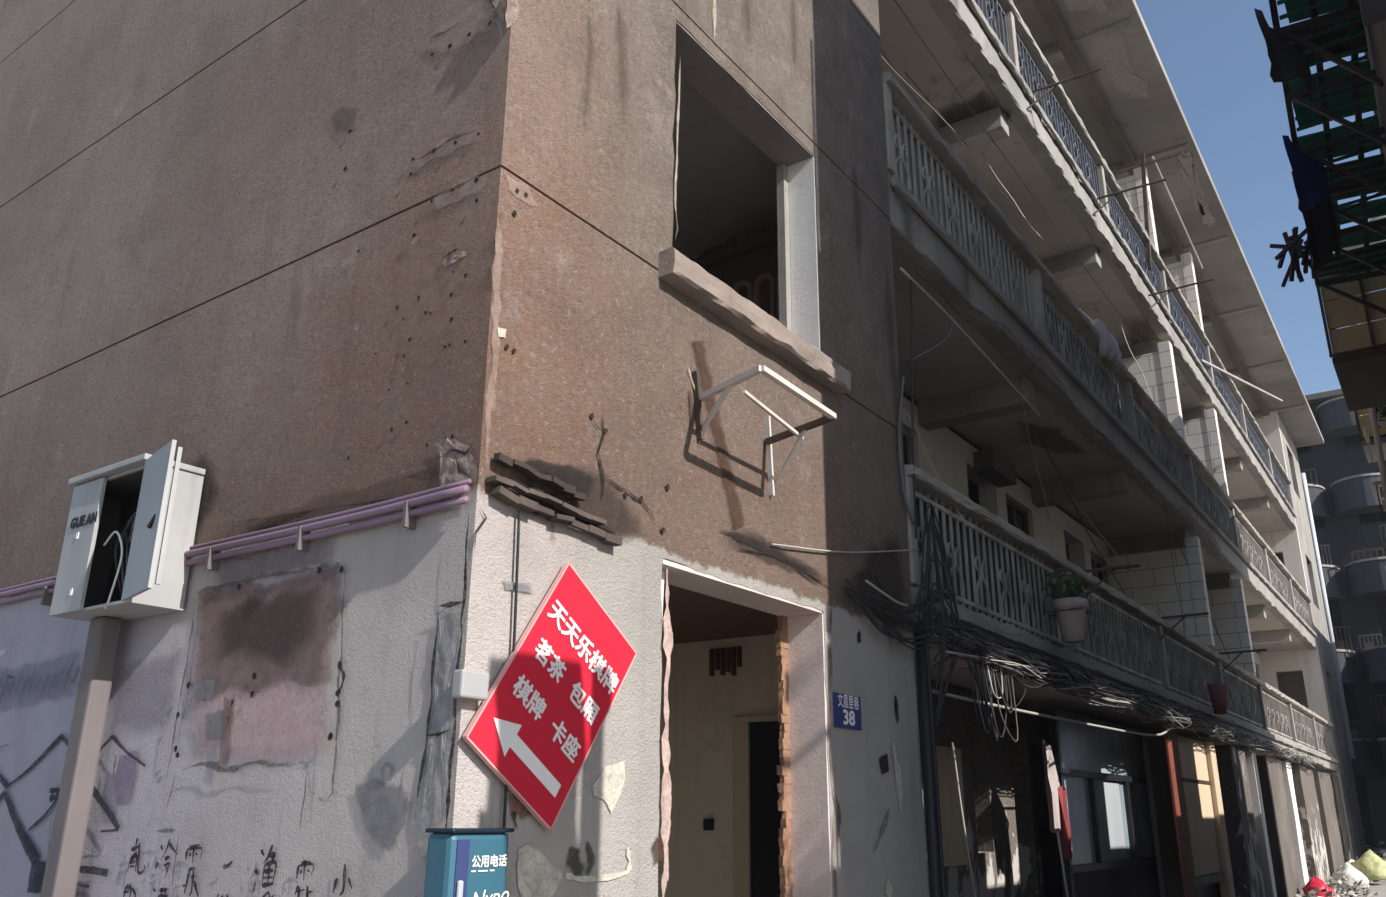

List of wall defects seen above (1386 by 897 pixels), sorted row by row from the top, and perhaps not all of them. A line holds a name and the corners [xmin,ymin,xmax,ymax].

spalling [488,0,519,27]
spalling [409,132,480,176]
peeling [165,562,345,828]
spalling [415,601,464,862]